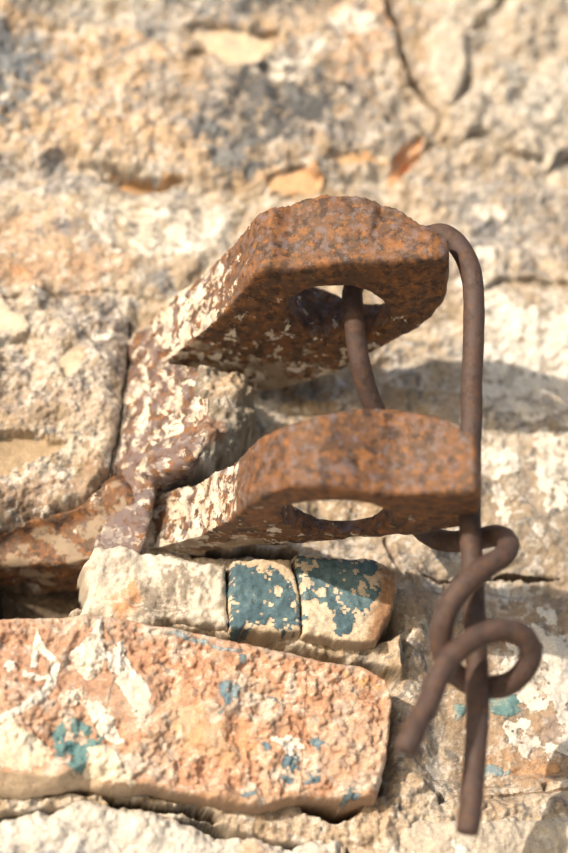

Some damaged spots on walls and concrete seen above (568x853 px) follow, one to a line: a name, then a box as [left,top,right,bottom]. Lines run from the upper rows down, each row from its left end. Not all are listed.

crack [322,76,426,136]
crack [385,0,440,114]
peeling [476,246,499,263]
peeling [481,293,568,525]
peeling [161,556,382,663]
crack [423,573,451,585]
crack [488,573,560,584]
peeling [0,628,136,788]
peeling [70,615,154,724]
peeling [261,734,329,785]
crack [484,788,568,799]
peeling [489,606,568,761]